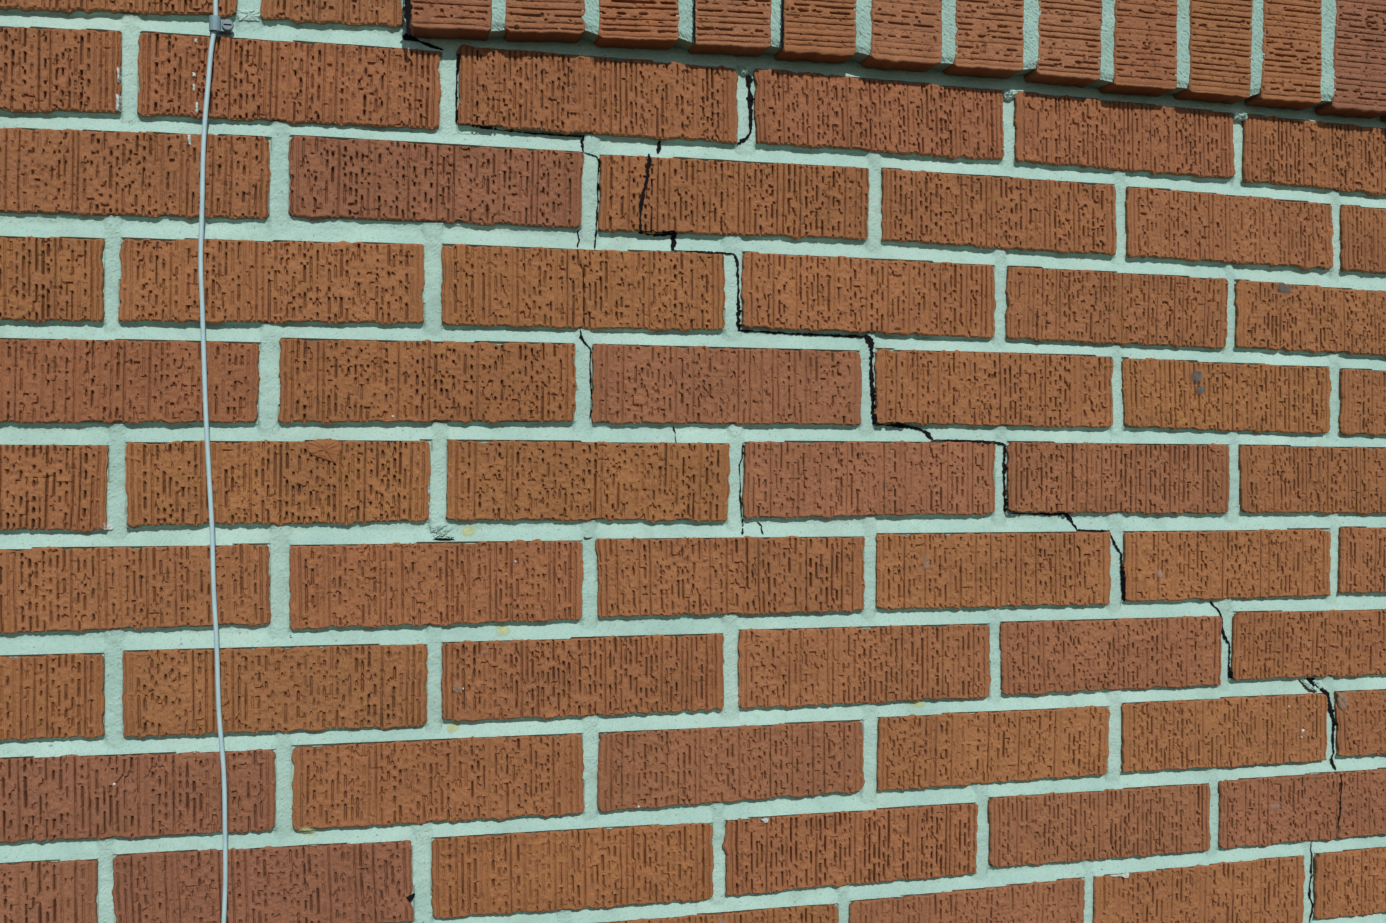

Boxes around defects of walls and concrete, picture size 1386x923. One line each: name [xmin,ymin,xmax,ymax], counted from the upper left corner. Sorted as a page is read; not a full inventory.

crack [737,73,755,145]
crack [455,53,601,417]
crack [639,140,1126,602]
crack [1210,601,1233,679]
crack [1308,684,1343,923]